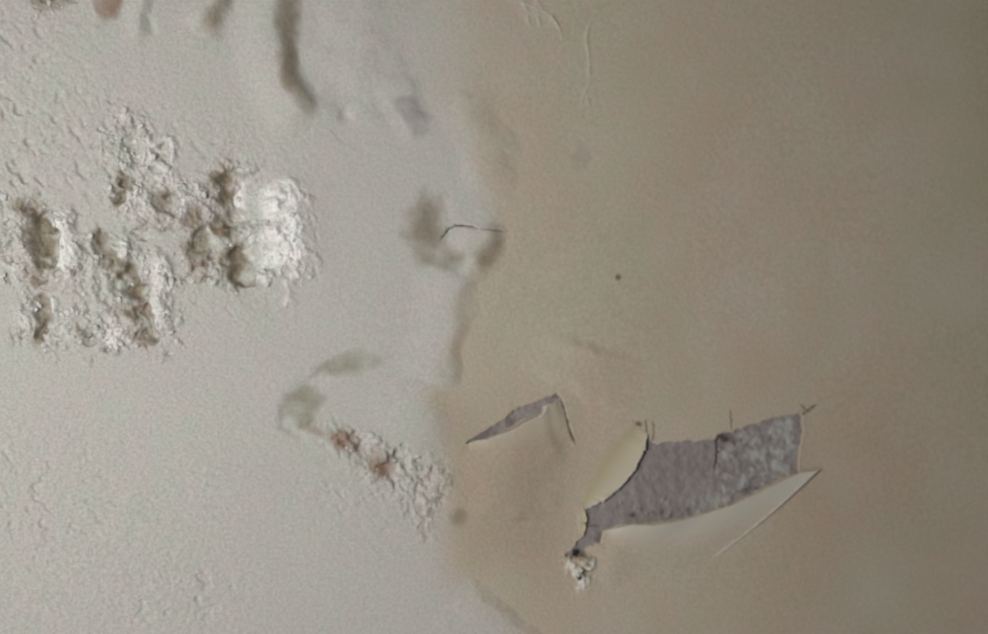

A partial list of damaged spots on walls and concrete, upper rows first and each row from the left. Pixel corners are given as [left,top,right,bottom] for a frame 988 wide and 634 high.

flaking render [0,88,324,370]
crack [440,224,505,240]
flaking render [299,413,469,545]
peeling [557,413,818,600]